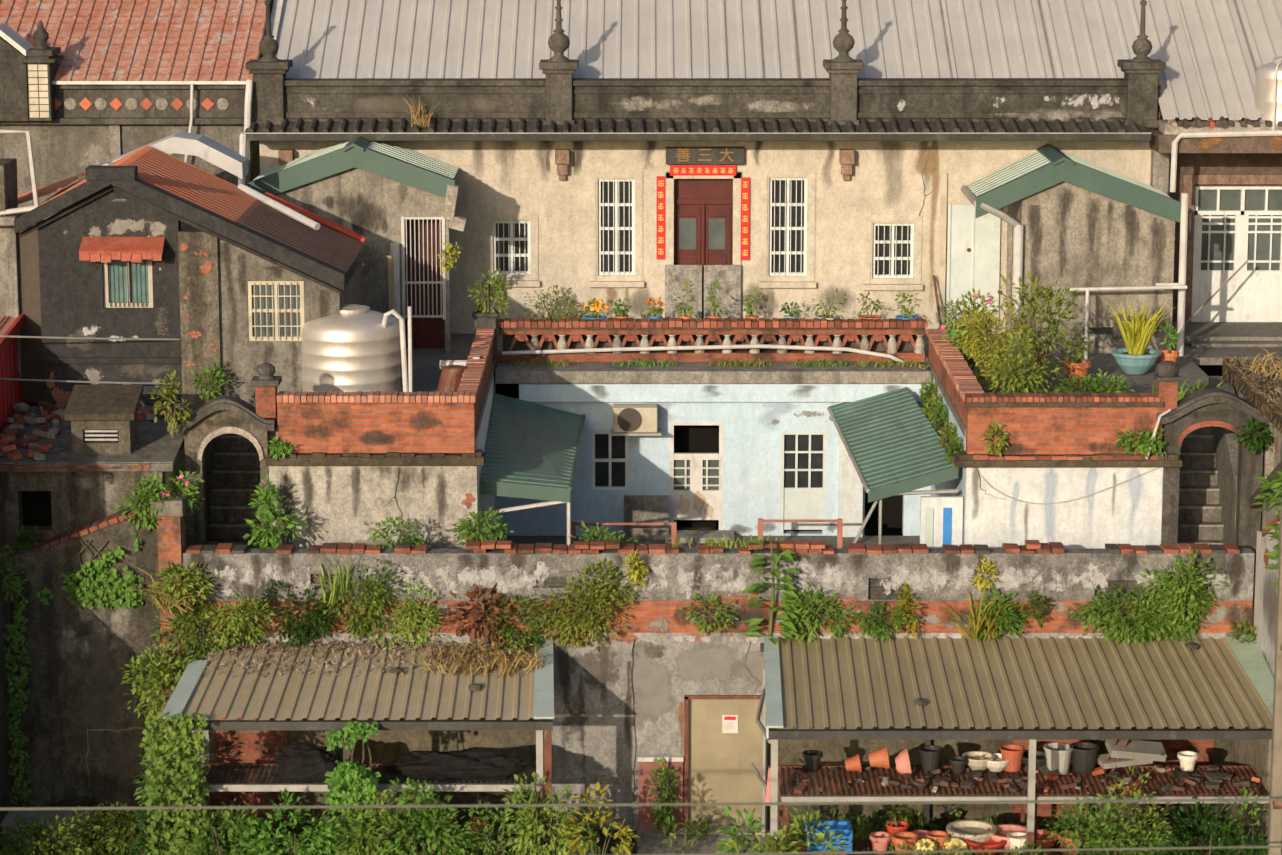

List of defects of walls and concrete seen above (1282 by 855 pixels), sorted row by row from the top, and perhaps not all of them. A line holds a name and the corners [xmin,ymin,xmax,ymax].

peeling [1044,94,1119,109]
peeling [89,219,166,237]
water stain [1030,205,1042,280]
water stain [1060,189,1071,269]
water stain [1090,205,1162,292]
spalling [180,242,218,353]
water stain [362,431,391,444]
water stain [414,415,439,428]
water stain [379,468,446,514]
peeling [204,561,310,596]
peeling [335,561,637,643]
water stain [1159,555,1277,627]